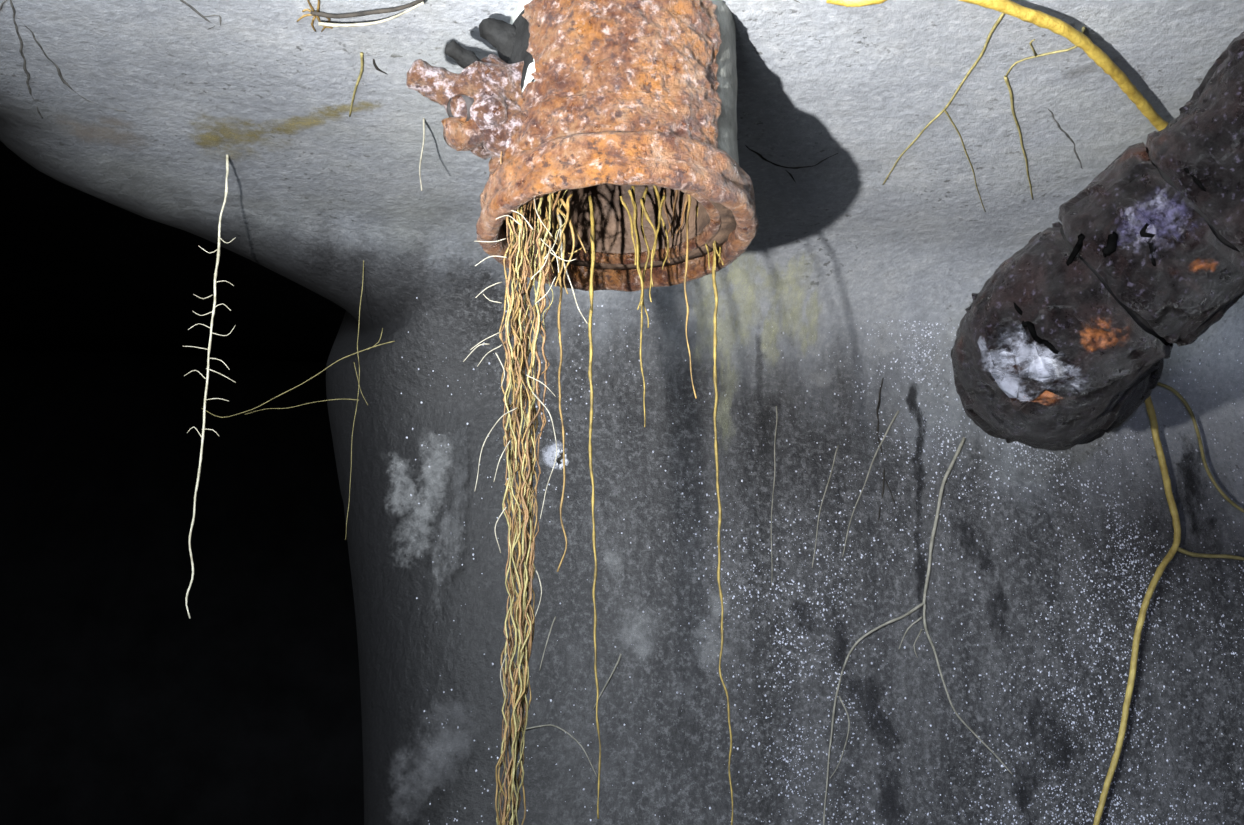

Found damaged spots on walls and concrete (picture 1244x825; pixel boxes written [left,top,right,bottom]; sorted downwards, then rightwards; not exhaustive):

crack [0,0,126,119]
leakage [906,386,926,505]
leakage [1179,448,1215,532]
leakage [826,606,847,666]
leakage [914,524,928,617]
leakage [987,588,1008,634]
leakage [849,677,898,745]
leakage [1014,769,1037,825]